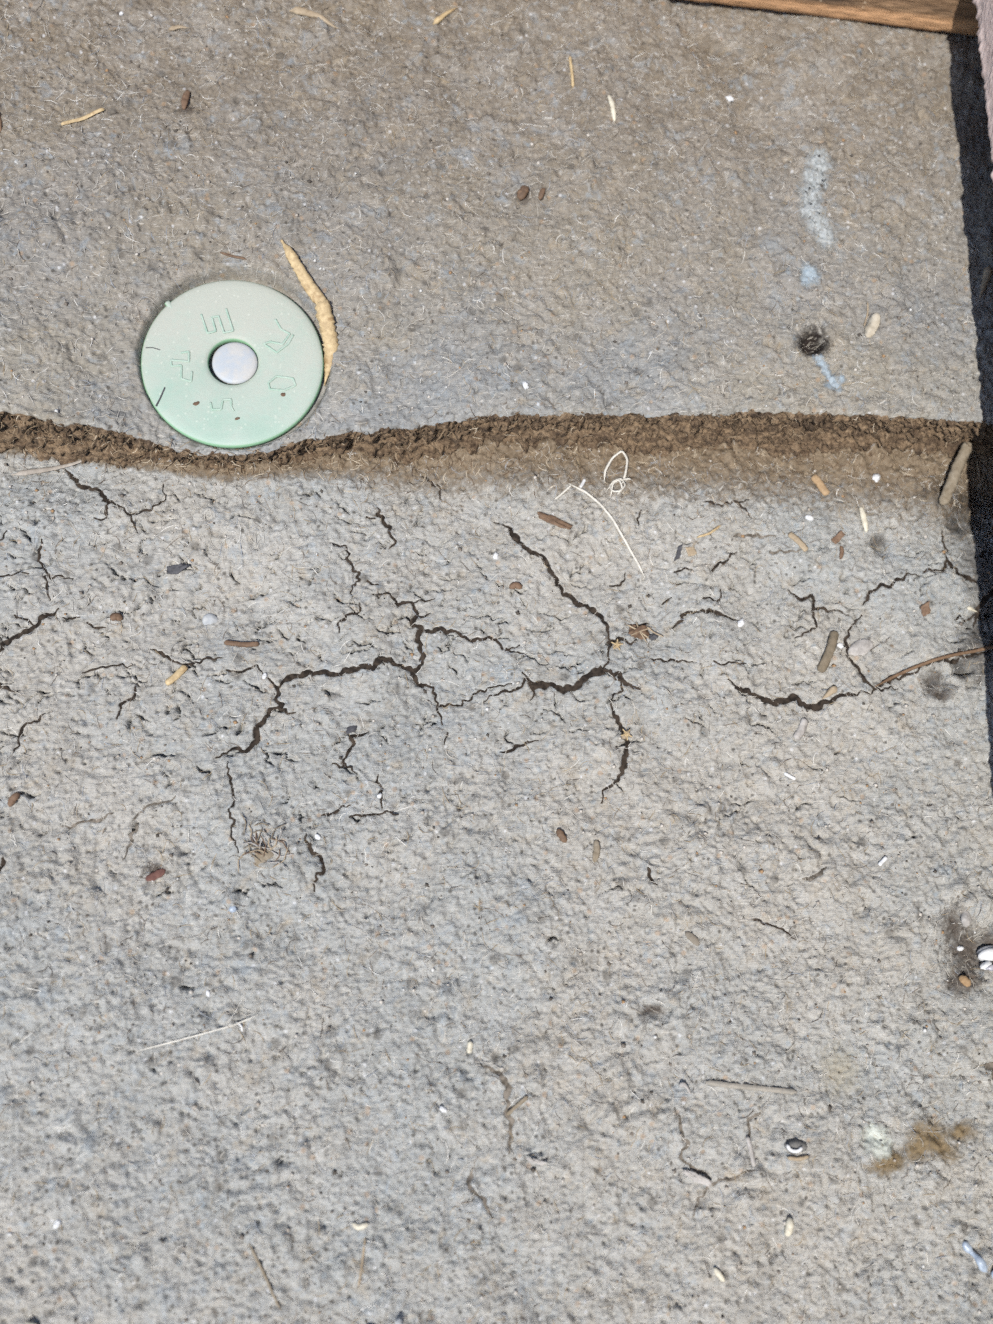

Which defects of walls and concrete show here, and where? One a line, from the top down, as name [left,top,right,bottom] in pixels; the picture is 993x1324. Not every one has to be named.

crack [64,469,166,532]
crack [421,476,442,502]
crack [0,539,106,753]
crack [82,499,993,853]
crack [61,796,176,859]
crack [304,731,399,892]
crack [647,867,658,886]
crack [802,867,827,881]